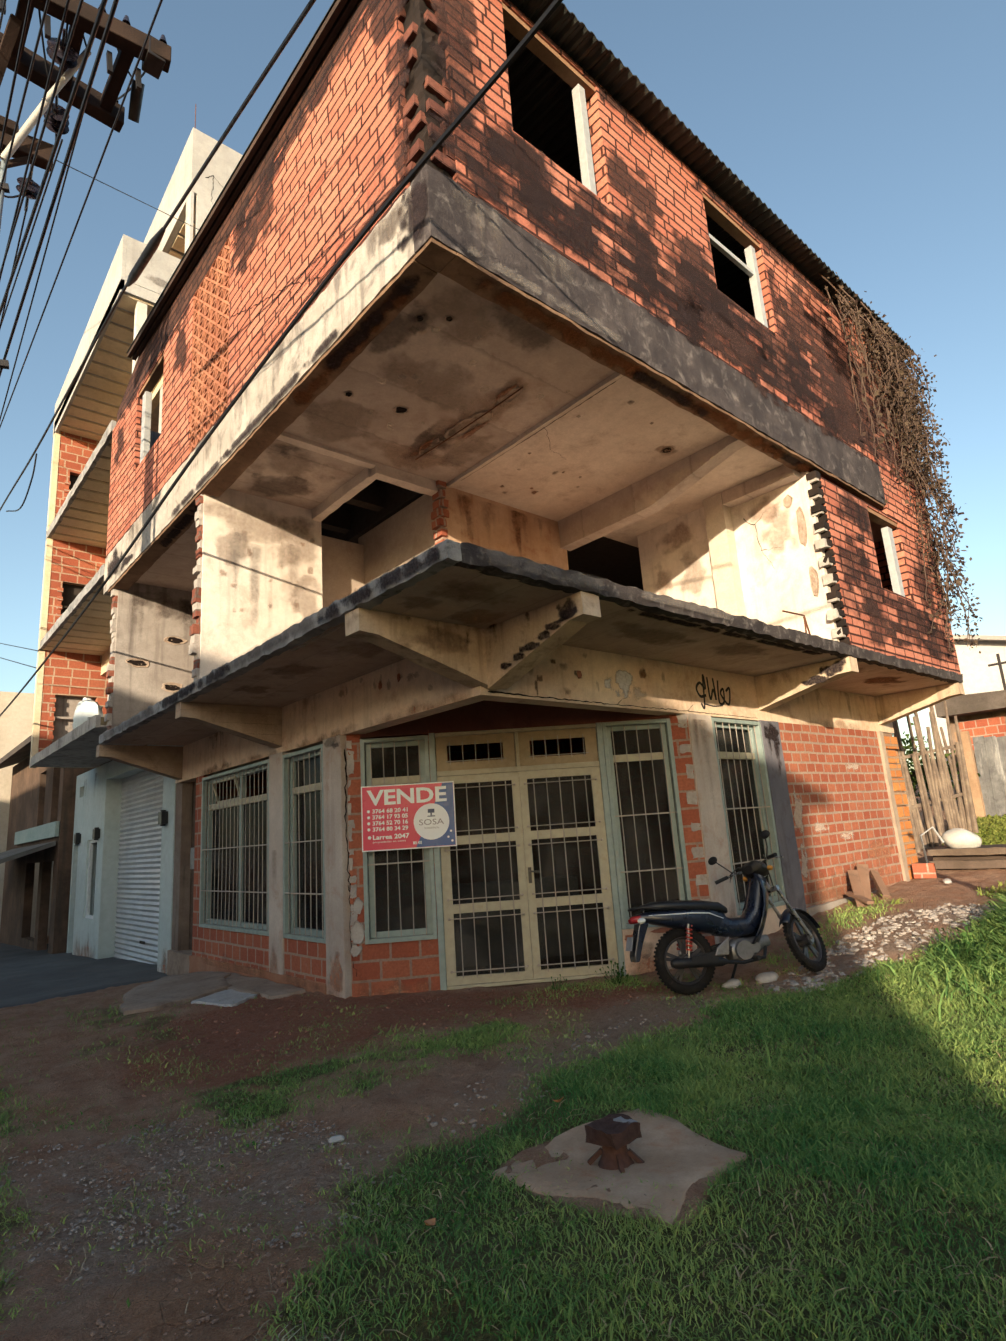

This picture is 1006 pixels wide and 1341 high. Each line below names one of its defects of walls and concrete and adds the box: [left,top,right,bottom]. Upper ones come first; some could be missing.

leakage [230,0,428,275]
leakage [427,0,921,494]
spalling [409,384,523,460]
flaking render [783,494,807,547]
flaking render [809,566,819,597]
spalling [782,610,811,635]
flaking render [350,897,365,957]